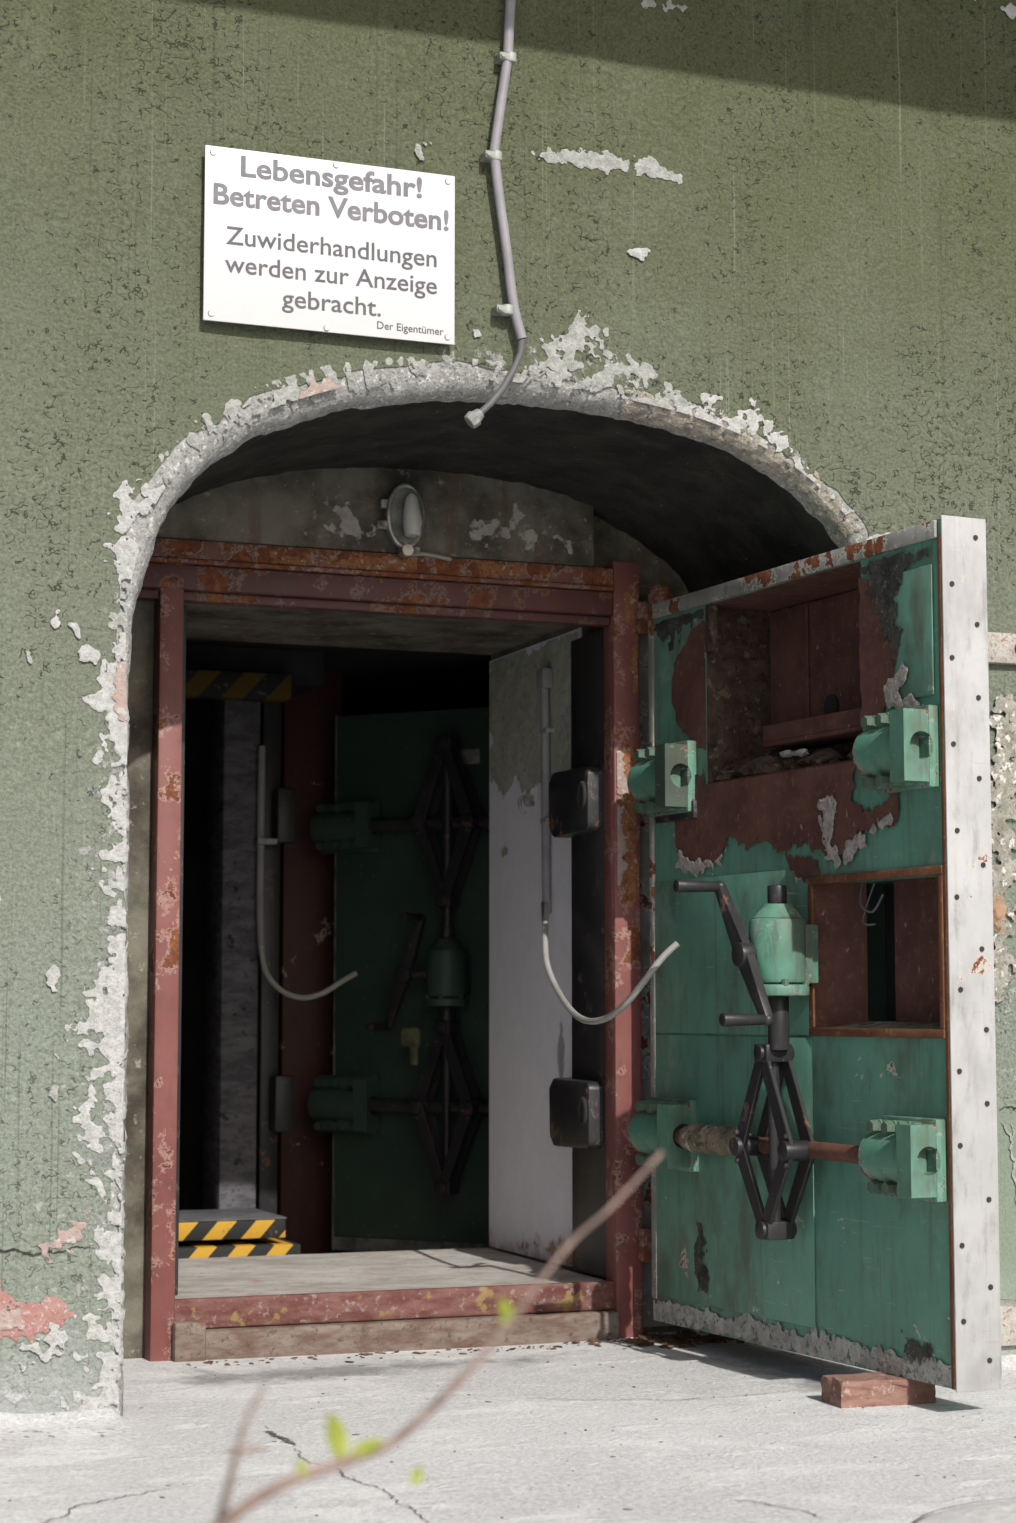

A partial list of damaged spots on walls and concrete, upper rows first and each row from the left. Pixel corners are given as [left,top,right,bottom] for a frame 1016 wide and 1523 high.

rust [269,549,418,572]
rust [671,621,706,750]
rust [858,578,898,726]
peeling [883,663,924,709]
peeling [0,310,893,1411]
rust [617,736,639,912]
rust [675,761,899,865]
spalling [989,693,1016,1009]
crack [999,1106,1016,1200]
peeling [653,1299,955,1388]
crack [43,1486,177,1523]
crack [265,1431,428,1523]